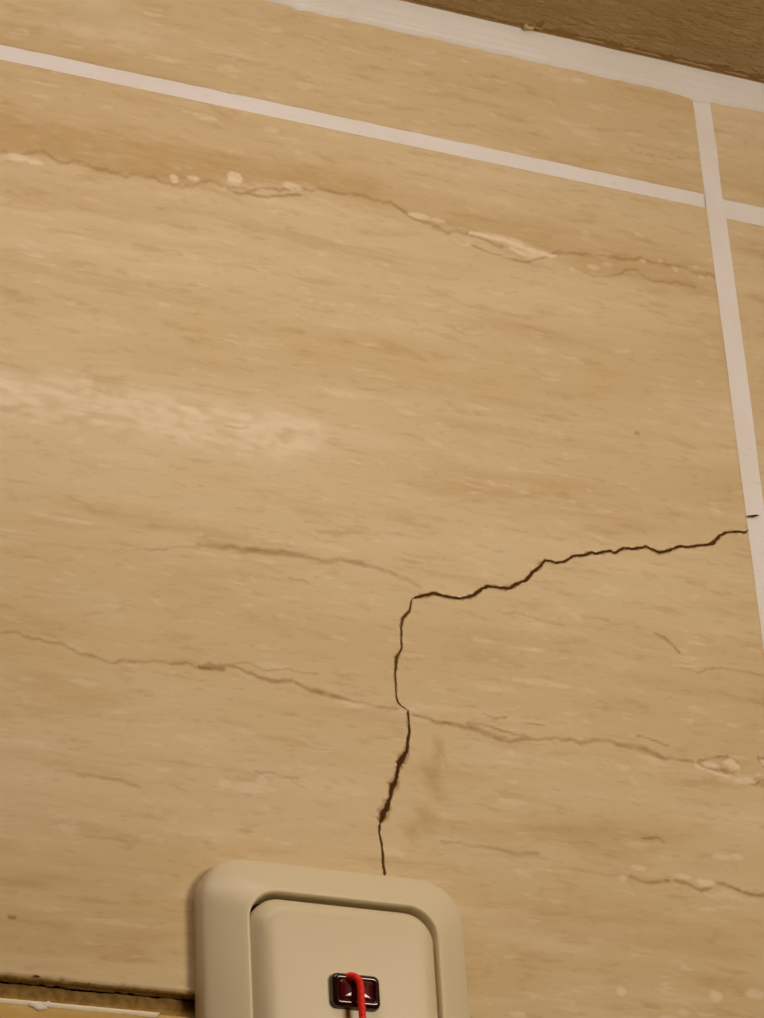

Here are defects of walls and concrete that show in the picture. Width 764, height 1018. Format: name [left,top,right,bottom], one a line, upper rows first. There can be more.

crack [378,515,759,876]